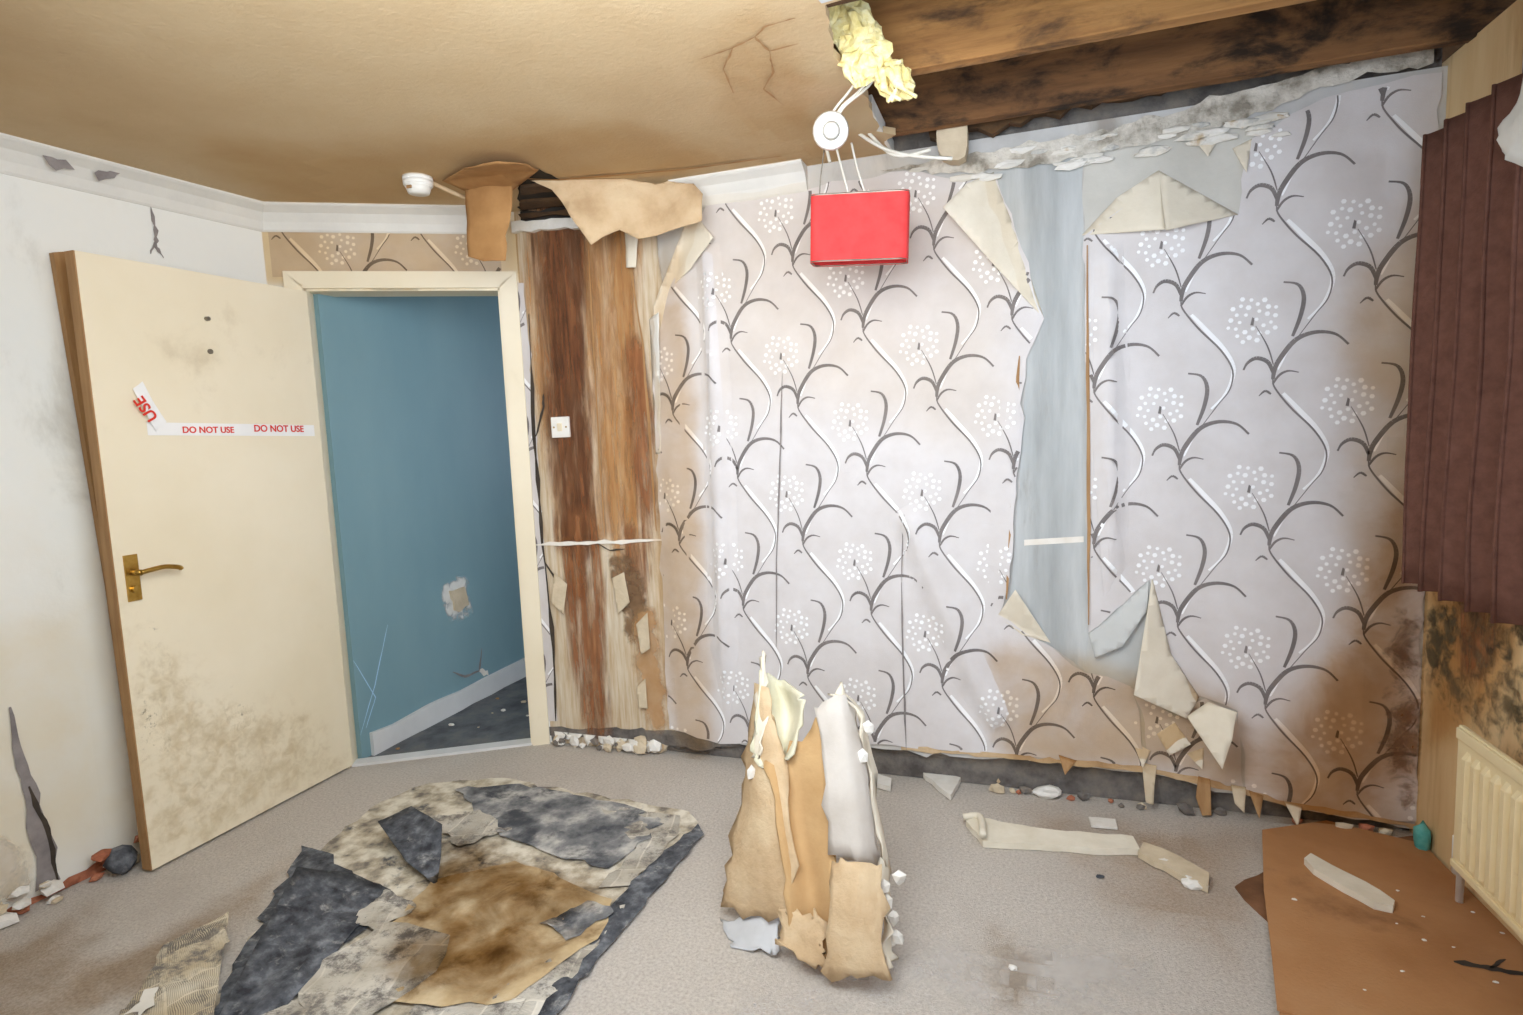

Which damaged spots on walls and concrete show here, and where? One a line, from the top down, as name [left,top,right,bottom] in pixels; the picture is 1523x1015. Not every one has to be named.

flaking render [819,0,858,8]
flaking render [511,169,579,234]
water stain [514,209,675,754]
flaking render [442,577,471,618]
flaking render [551,573,567,614]
flaking render [610,556,650,654]
flaking render [637,679,647,708]
water stain [1391,602,1523,735]
flaking render [0,848,112,929]